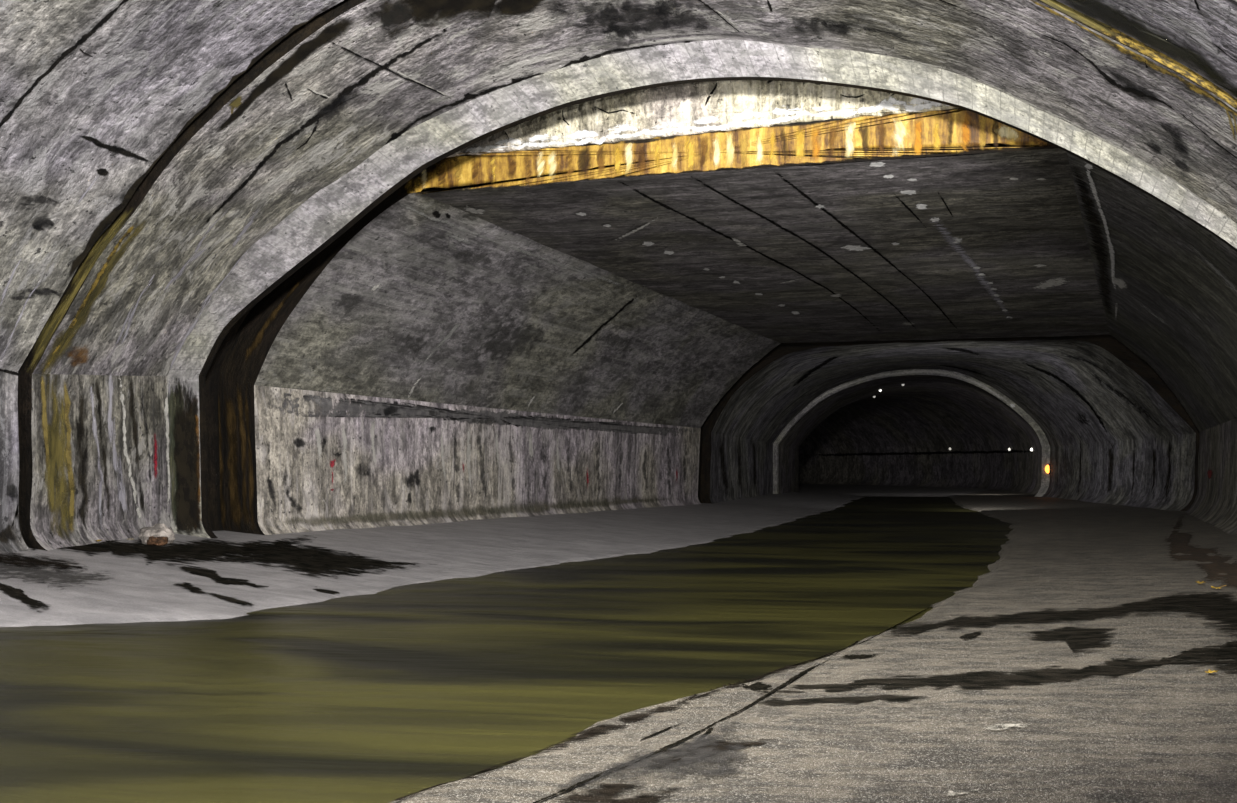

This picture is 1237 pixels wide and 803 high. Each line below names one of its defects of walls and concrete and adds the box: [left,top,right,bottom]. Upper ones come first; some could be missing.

crack [0,0,128,127]
leakage [572,0,708,46]
leakage [793,19,907,41]
rust [1030,0,1237,139]
leakage [1069,0,1237,97]
leakage [567,119,839,147]
rust [408,109,1051,194]
crack [621,170,986,377]
leakage [1034,264,1070,289]
crack [1022,363,1107,432]
crack [533,604,934,803]